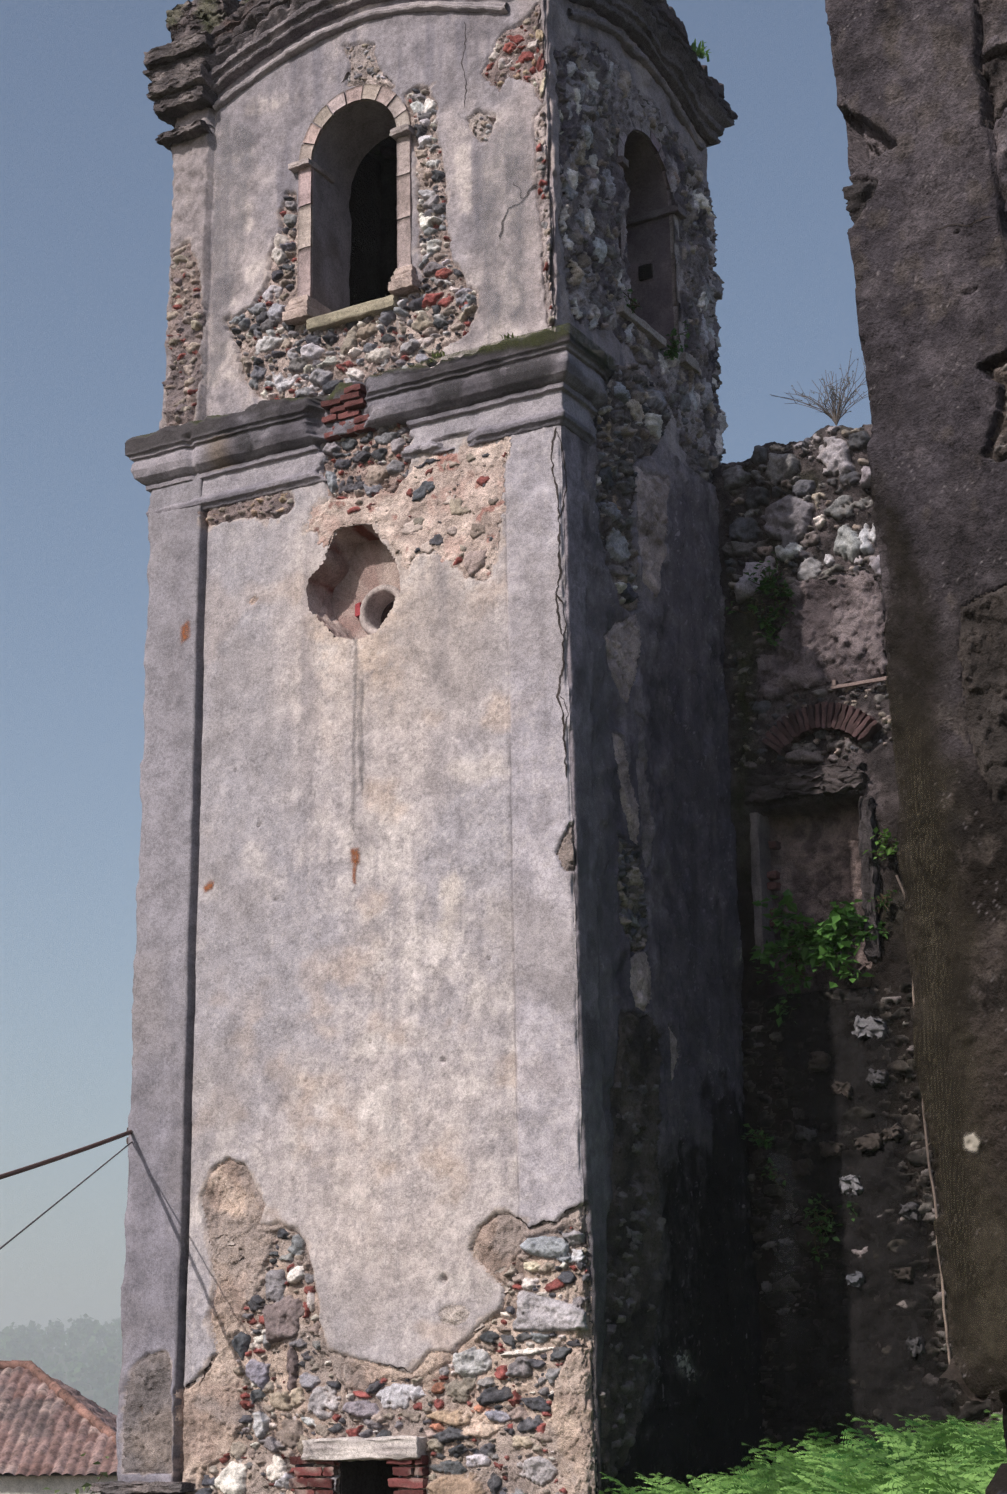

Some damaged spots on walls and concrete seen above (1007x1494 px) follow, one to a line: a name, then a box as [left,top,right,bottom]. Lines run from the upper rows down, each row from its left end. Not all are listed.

crack [499,182,538,238]
spalling [121,5,728,1494]
crack [551,428,568,778]
water stain [874,506,980,1342]
water stain [597,987,954,1494]